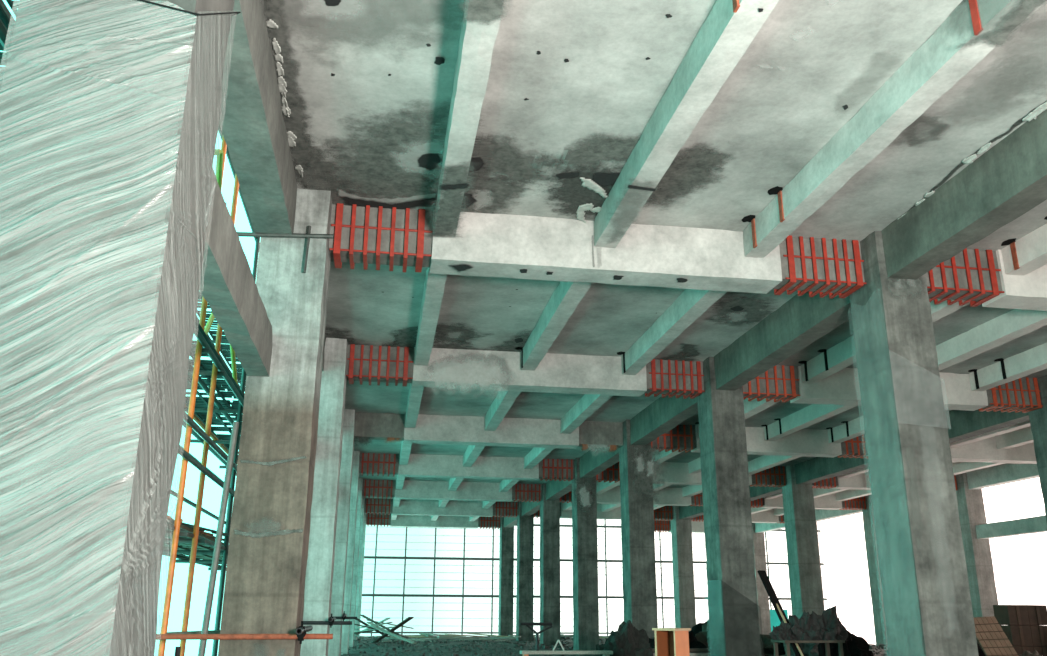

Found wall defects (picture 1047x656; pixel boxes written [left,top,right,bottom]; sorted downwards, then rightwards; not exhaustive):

peeling [266,19,291,117]
peeling [287,131,297,149]
damp [263,0,549,237]
damp [628,145,728,207]